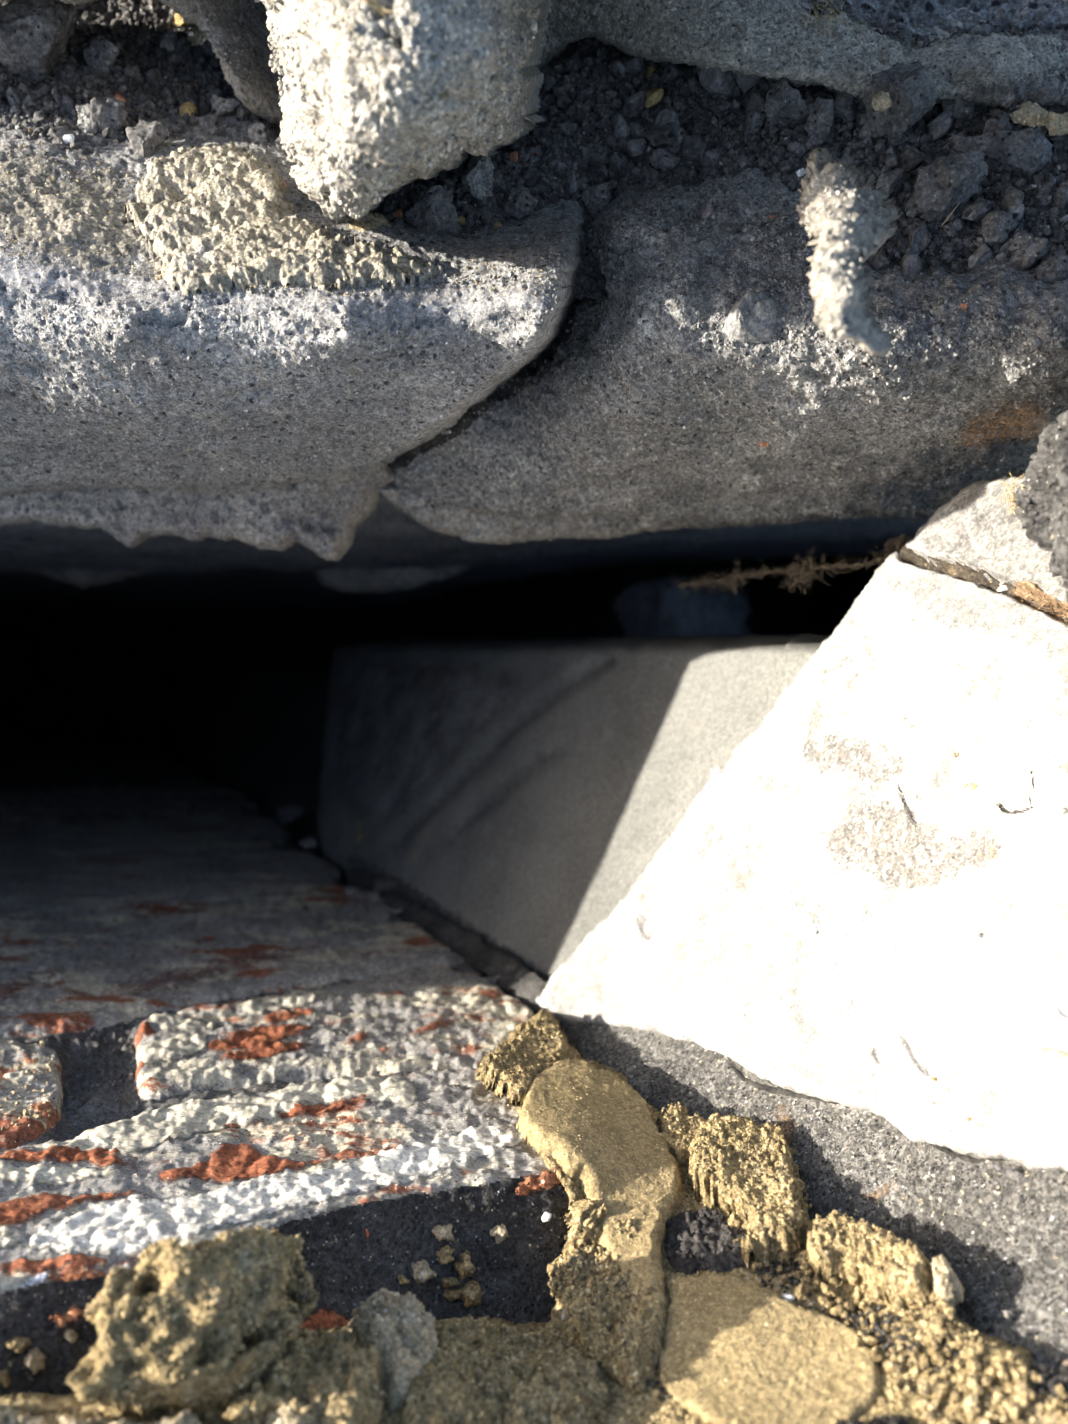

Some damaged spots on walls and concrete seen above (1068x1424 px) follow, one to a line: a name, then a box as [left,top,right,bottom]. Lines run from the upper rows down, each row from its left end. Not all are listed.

crack [898,783,917,823]
crack [997,770,1035,814]
peeling [206,1007,314,1060]
peeling [346,1032,367,1044]
peeling [0,1021,155,1167]
peeling [263,1094,366,1119]
peeling [160,1120,327,1183]
peeling [0,1190,136,1224]
peeling [0,1253,109,1281]